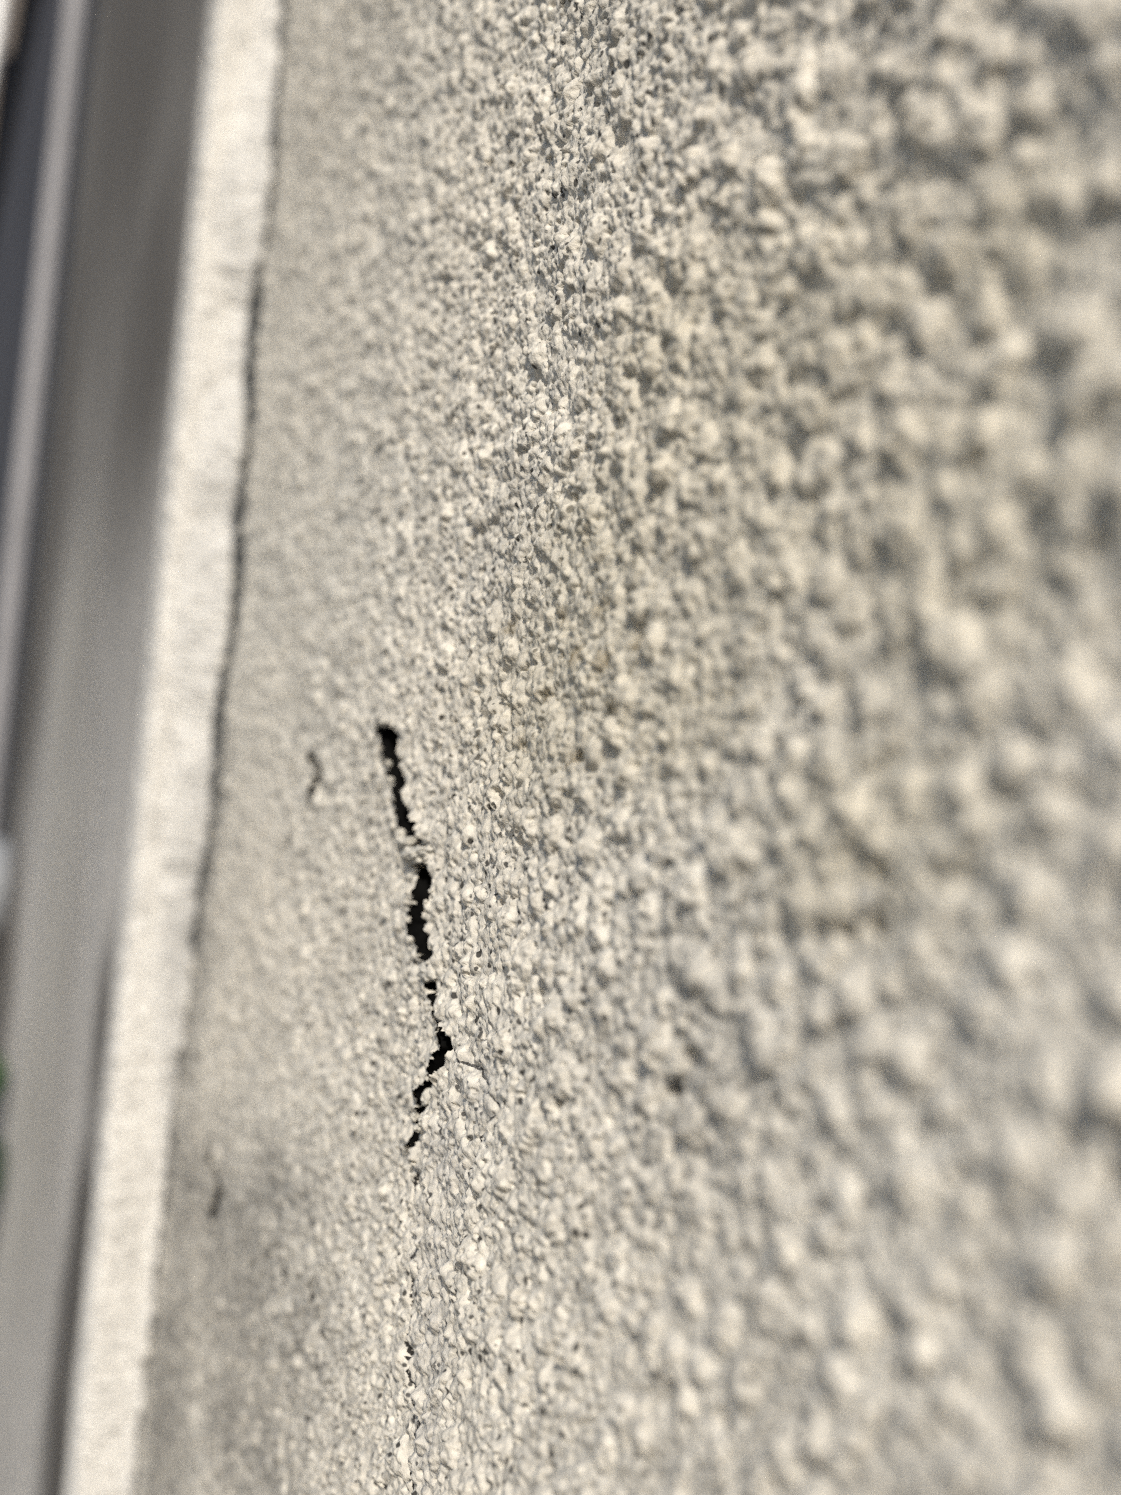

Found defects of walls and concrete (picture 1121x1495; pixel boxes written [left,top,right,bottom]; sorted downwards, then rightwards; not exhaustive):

crack [130,0,327,1495]
crack [374,718,500,1191]
crack [404,1239,421,1490]